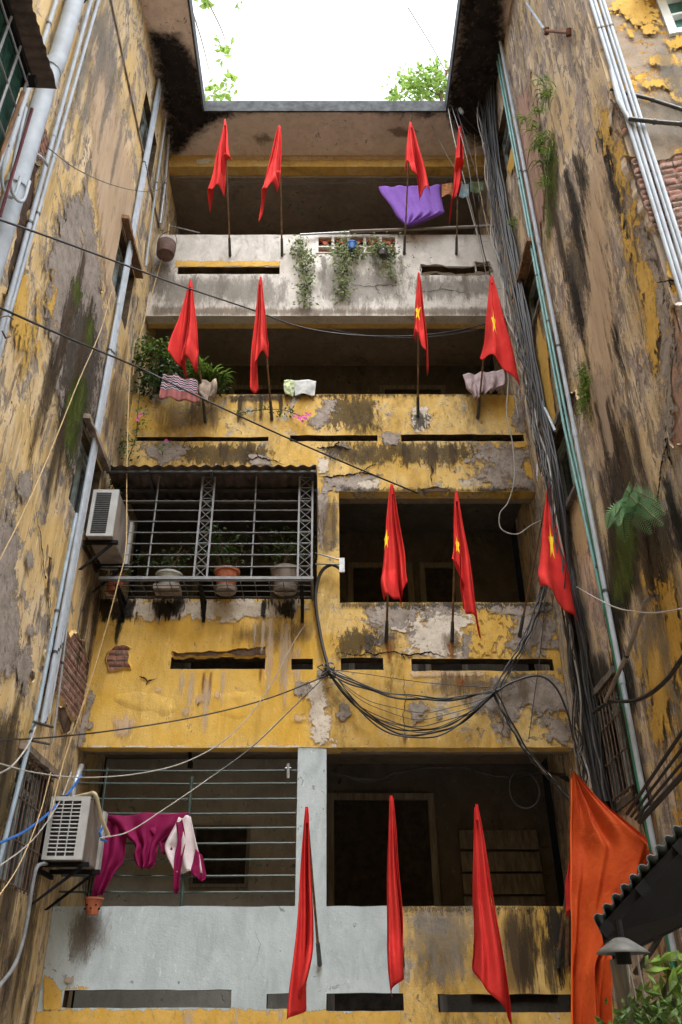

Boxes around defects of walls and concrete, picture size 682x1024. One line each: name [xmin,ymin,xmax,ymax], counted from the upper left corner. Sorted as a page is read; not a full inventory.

peeling [591,0,682,104]
damp [595,122,632,262]
peeling [2,33,136,481]
damp [547,143,606,418]
damp [29,251,103,521]
damp [605,293,625,378]
peeling [464,394,535,491]
peeling [317,458,383,547]
peeling [0,465,352,747]
peeling [359,602,559,658]
peeling [406,668,573,747]
damp [495,906,571,994]